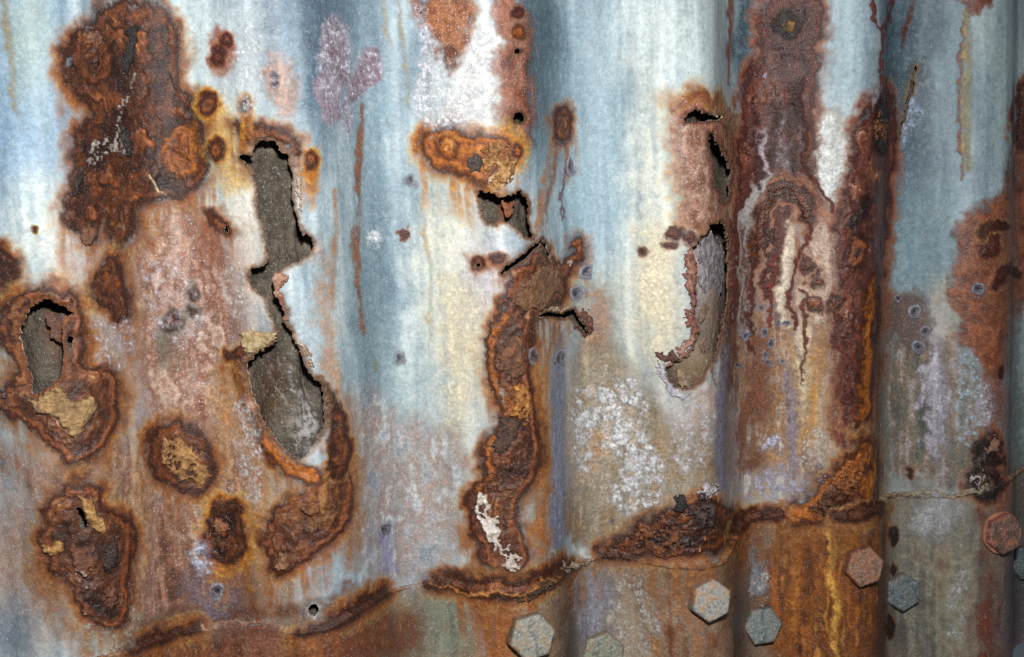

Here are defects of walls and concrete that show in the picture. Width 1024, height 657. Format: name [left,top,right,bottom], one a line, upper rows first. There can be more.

peeling [501,200,516,218]
peeling [655,128,773,388]
peeling [272,271,289,321]
peeling [46,312,63,343]
peeling [239,329,277,353]
corrosion [0,0,591,657]
corrosion [564,0,1024,657]